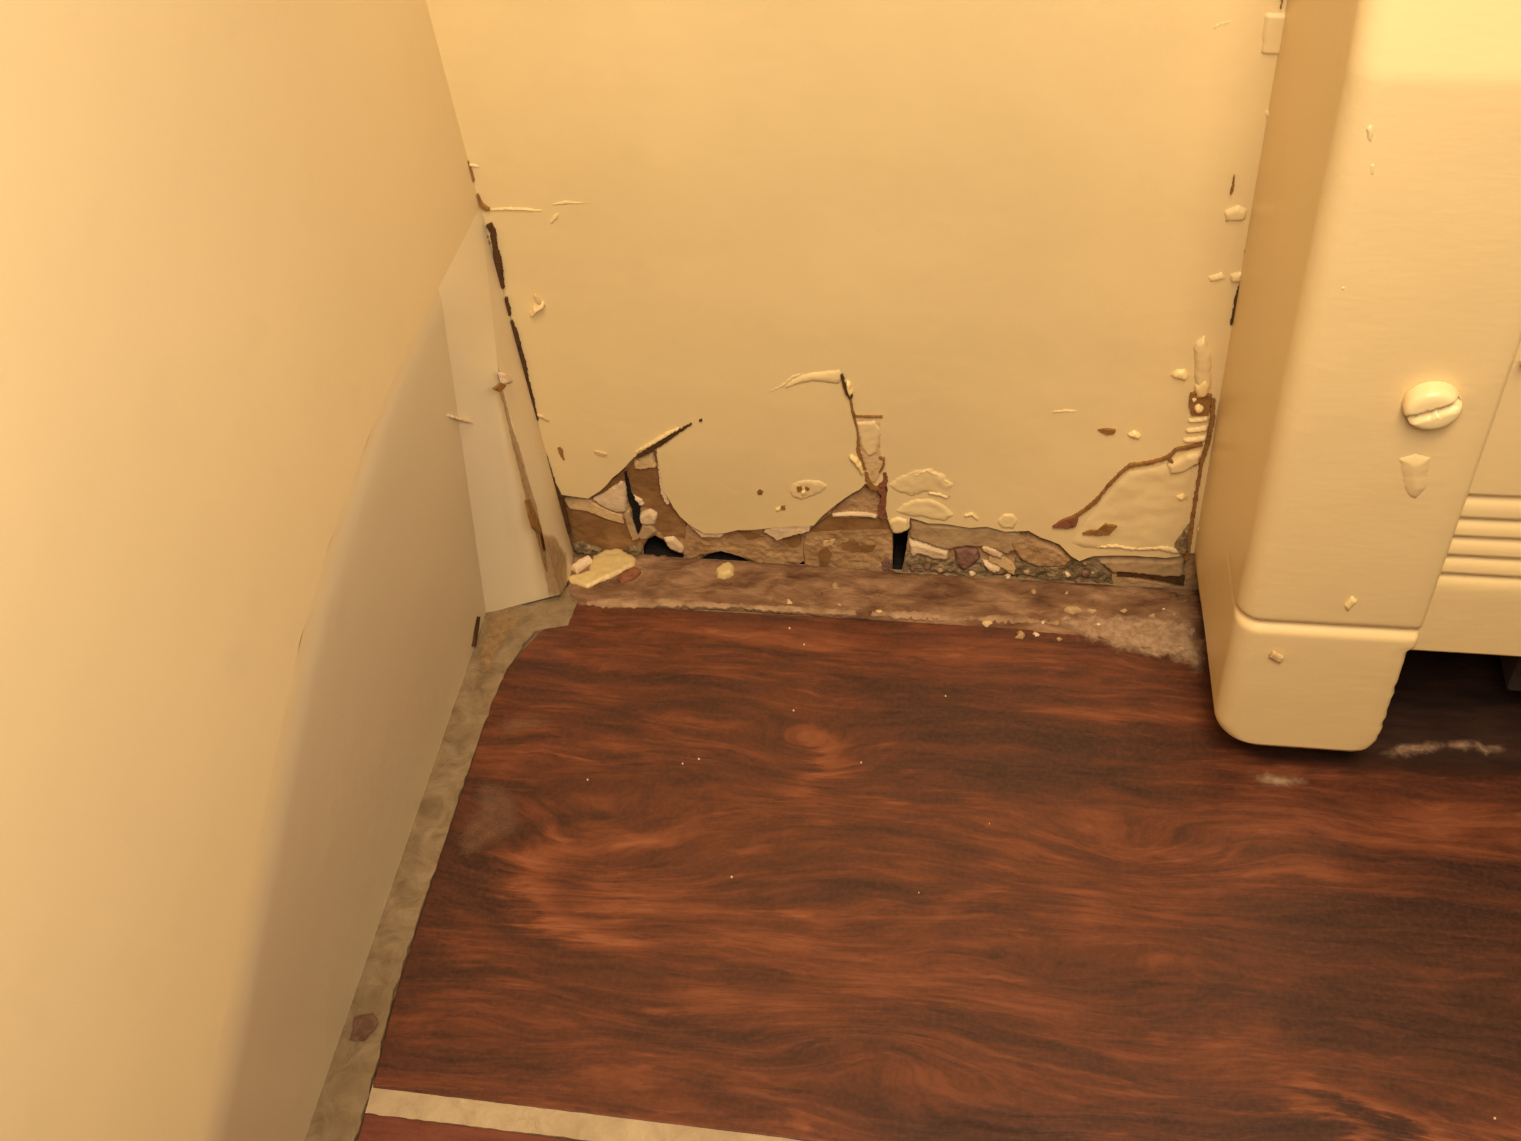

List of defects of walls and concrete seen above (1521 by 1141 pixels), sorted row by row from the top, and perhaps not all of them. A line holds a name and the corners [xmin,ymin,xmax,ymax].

peeling [1167,450,1202,473]
flaking render [493,369,1185,596]
peeling [472,616,480,647]